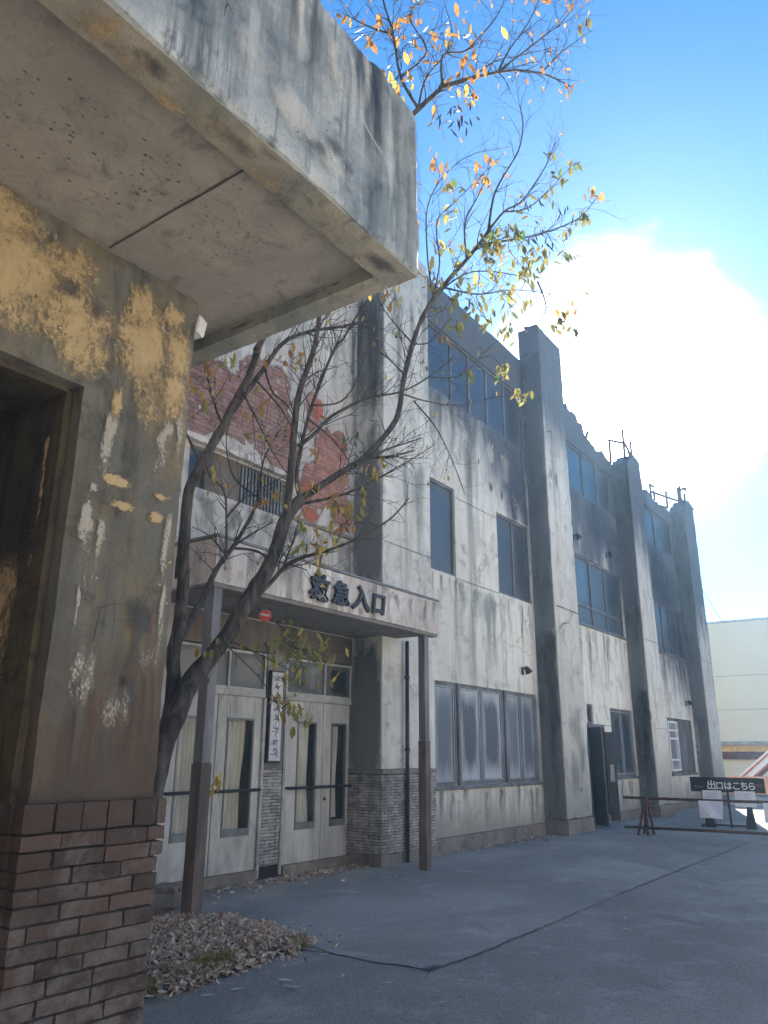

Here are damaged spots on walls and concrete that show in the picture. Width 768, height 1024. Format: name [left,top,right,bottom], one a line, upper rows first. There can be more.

peeling [0,185,351,534]
water stain [370,256,394,272]
spalling [608,429,633,463]
peeling [0,555,32,678]
water stain [455,350,568,820]
water stain [608,468,659,805]
water stain [671,514,714,777]